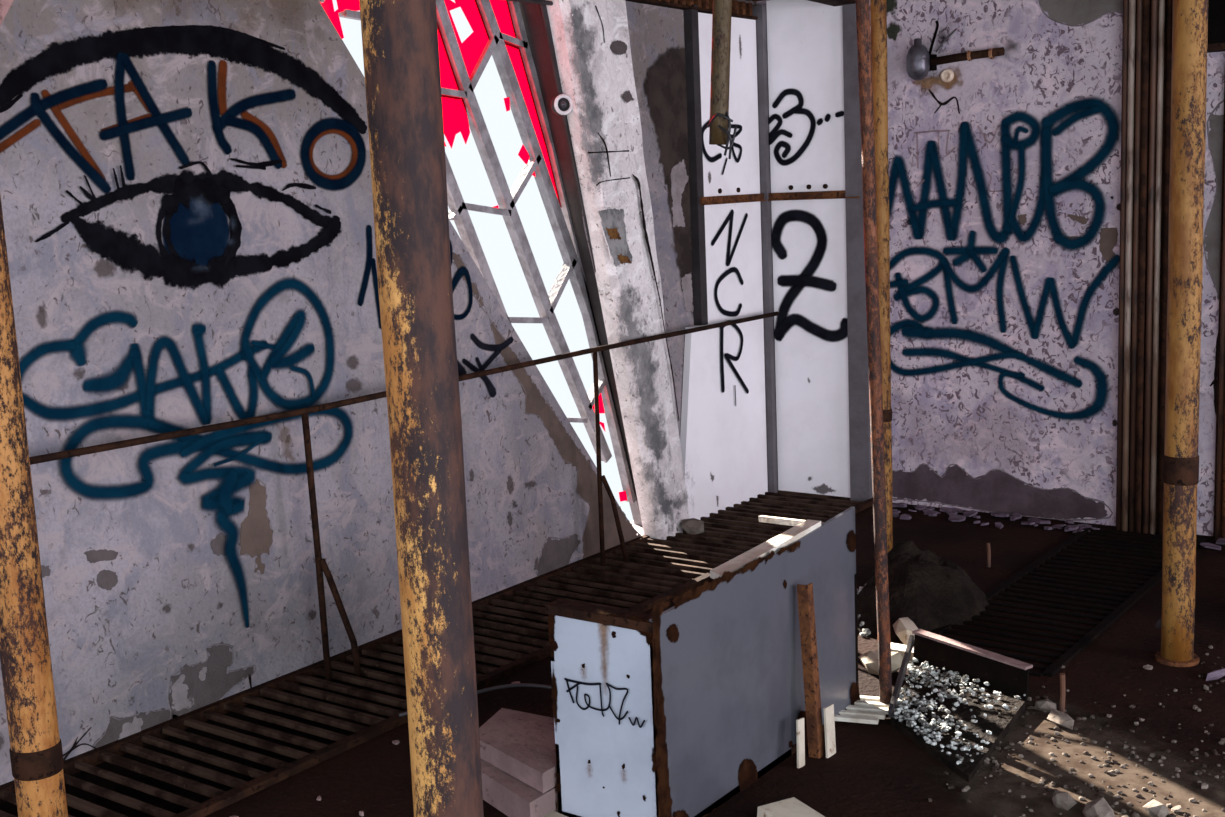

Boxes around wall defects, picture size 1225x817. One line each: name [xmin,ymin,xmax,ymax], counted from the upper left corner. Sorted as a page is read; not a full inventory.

water stain [568,2,607,189]
water stain [643,47,694,317]
spalling [211,478,273,575]
water stain [619,287,688,531]
spalling [892,463,1113,521]